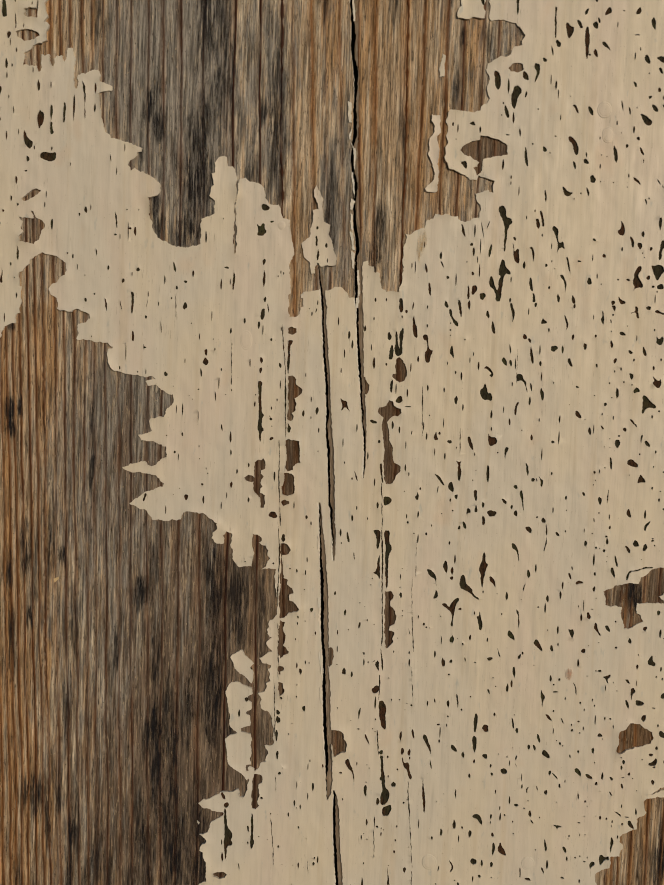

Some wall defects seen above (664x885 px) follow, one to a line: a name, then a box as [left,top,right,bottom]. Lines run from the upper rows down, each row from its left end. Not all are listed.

peeling [16,0,540,421]
crack [317,0,383,885]
peeling [378,317,433,484]
crack [395,365,461,448]
peeling [435,461,461,492]
peeling [0,253,301,885]
peeling [604,567,664,628]
crack [407,783,419,881]
peeling [589,787,664,885]